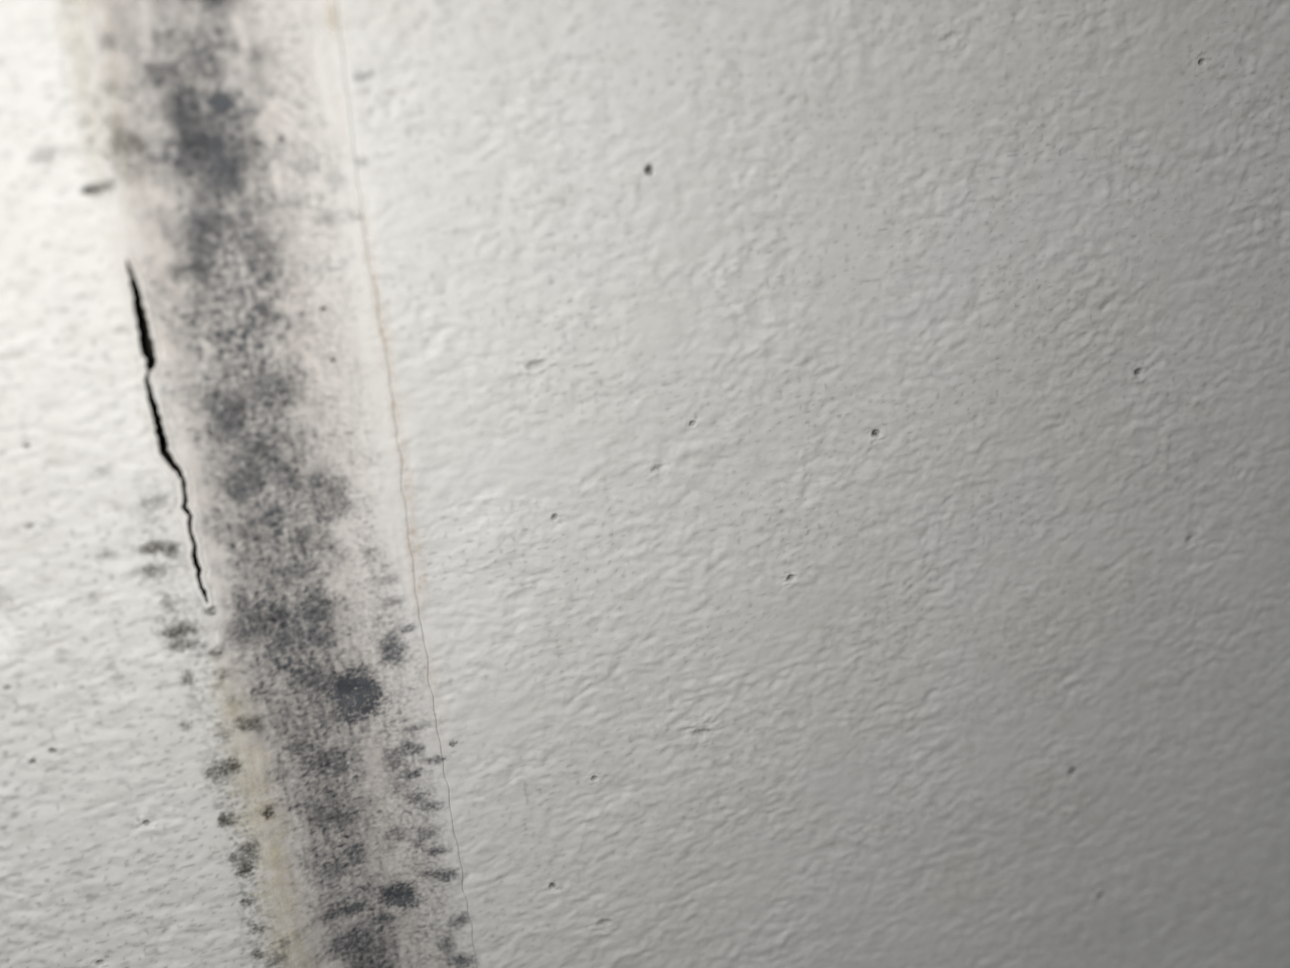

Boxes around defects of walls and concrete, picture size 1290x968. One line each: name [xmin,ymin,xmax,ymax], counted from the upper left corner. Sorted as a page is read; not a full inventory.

mould [149,0,382,735]
crack [119,251,215,611]
mould [144,542,174,575]
leakage [384,630,411,661]
mould [303,752,359,867]
mould [324,883,418,968]